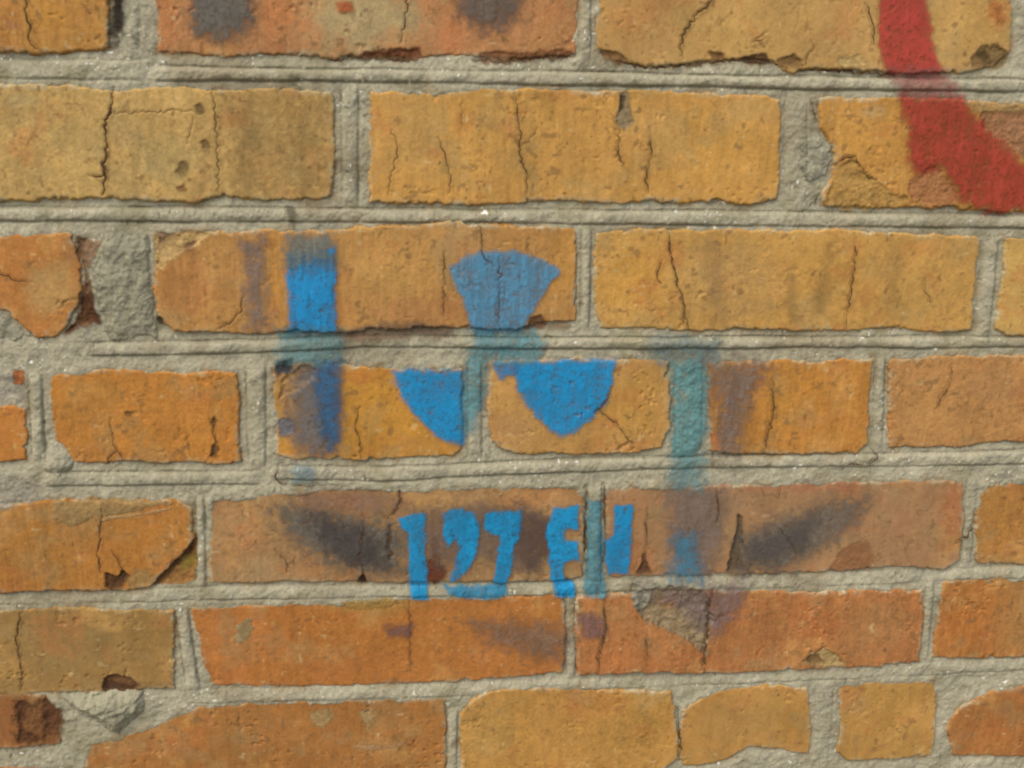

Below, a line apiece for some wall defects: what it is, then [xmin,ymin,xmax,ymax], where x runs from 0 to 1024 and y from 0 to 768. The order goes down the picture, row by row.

spalling [972,44,1007,68]
crack [92,88,220,195]
crack [515,91,536,202]
crack [615,131,653,192]
spalling [827,158,956,210]
spalling [62,236,101,335]
crack [480,228,503,324]
crack [656,234,690,331]
crack [845,238,857,331]
spalling [105,538,198,590]
spalling [631,554,714,654]
spalling [11,698,64,746]